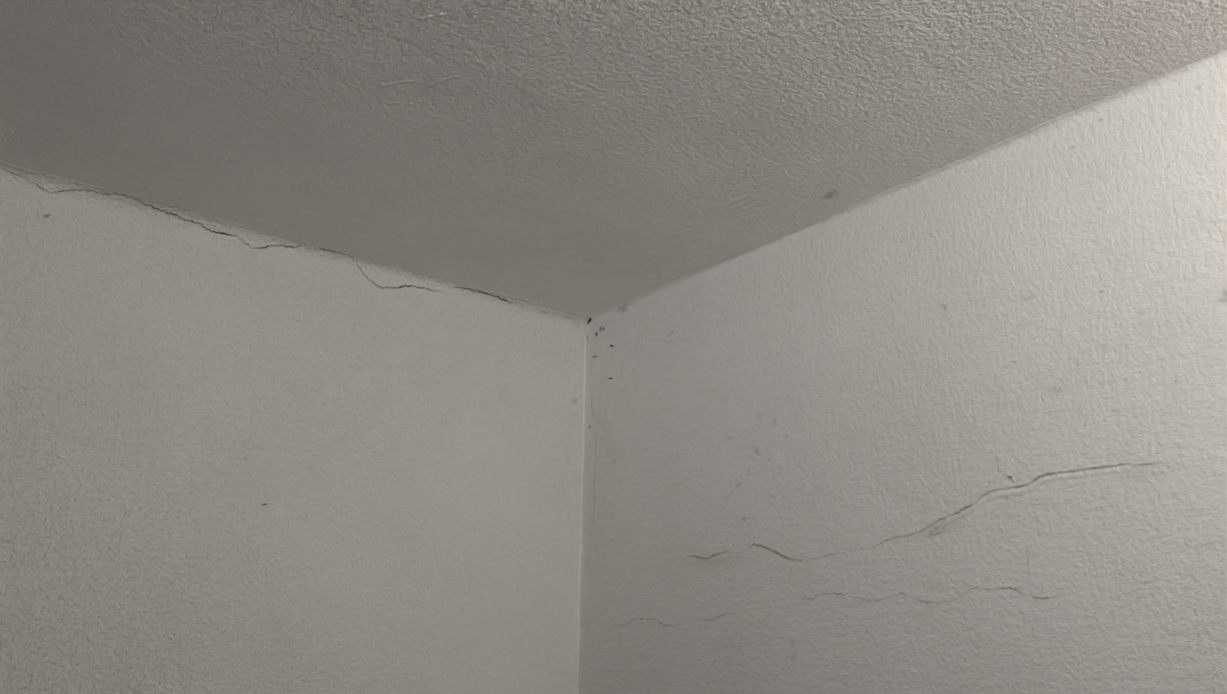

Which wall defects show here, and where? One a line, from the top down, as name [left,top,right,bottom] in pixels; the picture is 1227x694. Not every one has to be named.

crack [128,196,293,256]